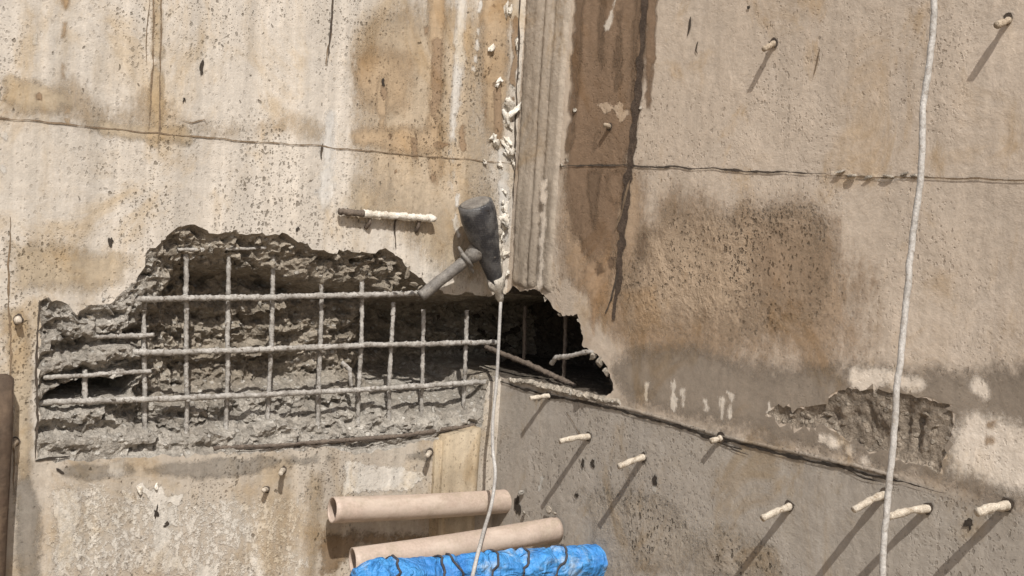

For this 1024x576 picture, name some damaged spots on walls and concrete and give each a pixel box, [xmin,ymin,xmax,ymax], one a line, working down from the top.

crack [0,0,521,200]
water stain [537,0,1024,505]
crack [560,164,1024,181]
spalling [34,224,627,576]
crack [500,381,942,493]
spalling [767,387,954,475]